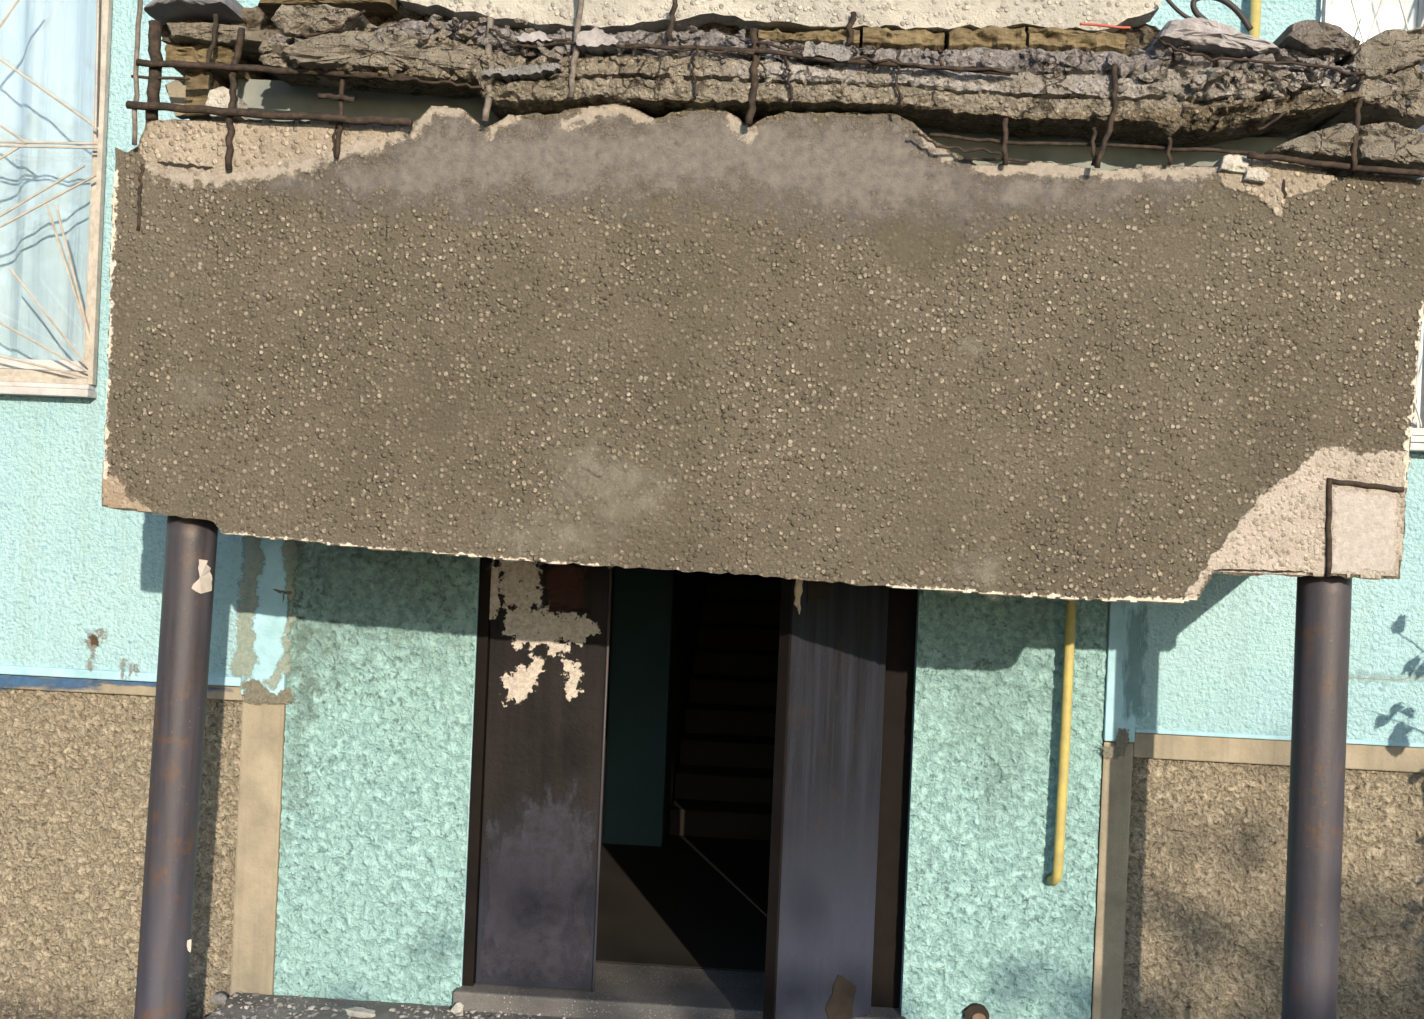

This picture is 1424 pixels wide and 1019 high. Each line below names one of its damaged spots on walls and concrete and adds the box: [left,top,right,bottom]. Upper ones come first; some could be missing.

peeling [126,0,1424,235]
spalling [101,169,152,512]
spalling [886,301,1424,603]
corrosion [85,629,107,658]
peeling [192,559,212,594]
peeling [226,532,405,705]
peeling [432,550,603,707]